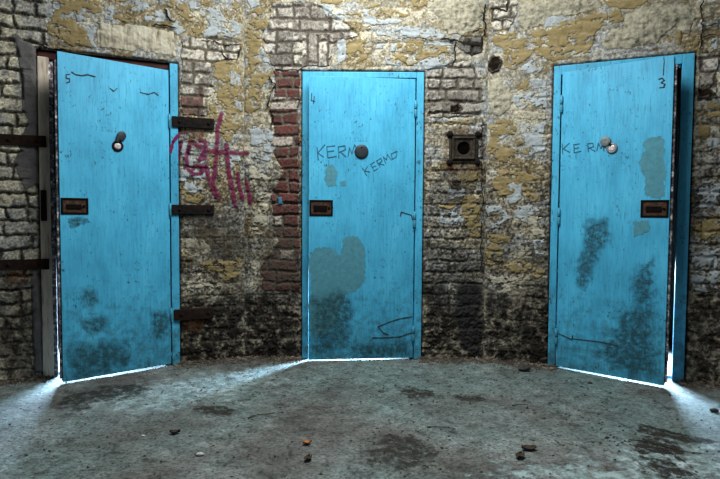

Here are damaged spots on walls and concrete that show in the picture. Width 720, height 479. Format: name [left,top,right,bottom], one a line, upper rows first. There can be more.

crack [333,0,512,65]
spalling [46,0,650,295]
peeling [638,136,667,199]
leakage [180,290,299,360]
leakage [485,288,547,364]